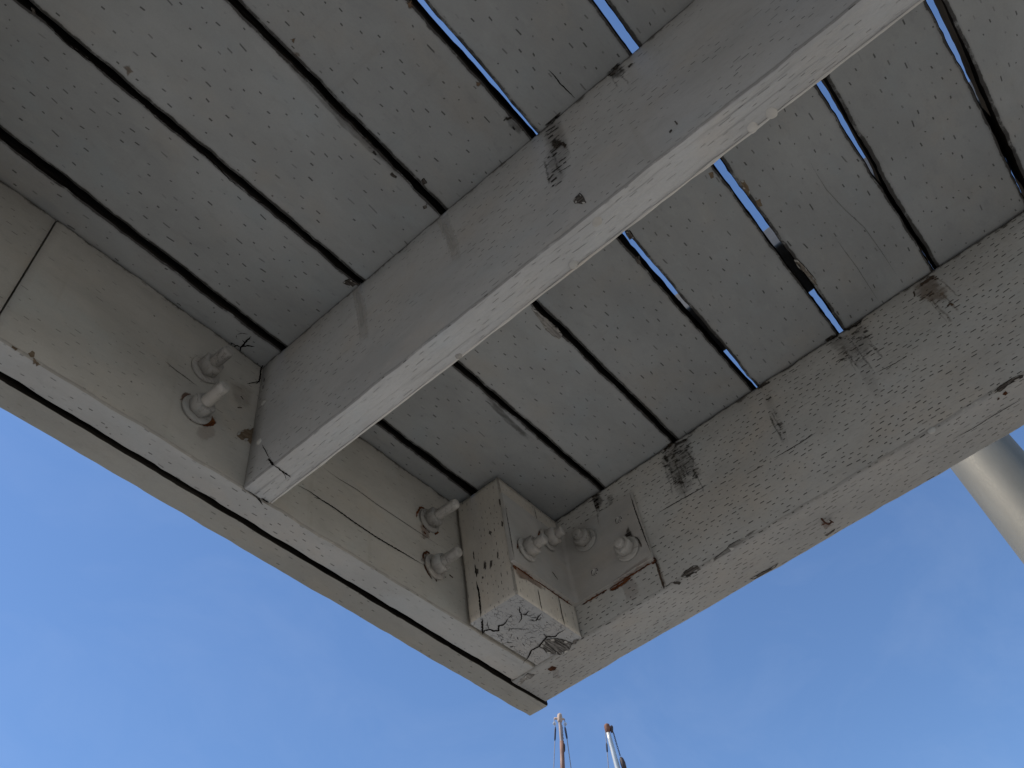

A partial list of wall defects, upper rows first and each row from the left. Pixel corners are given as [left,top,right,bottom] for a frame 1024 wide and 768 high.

water stain [545,112,570,187]
crack [231,333,265,384]
water stain [825,321,872,354]
crack [262,445,432,564]
crack [473,551,565,660]
corrosion [513,557,664,605]